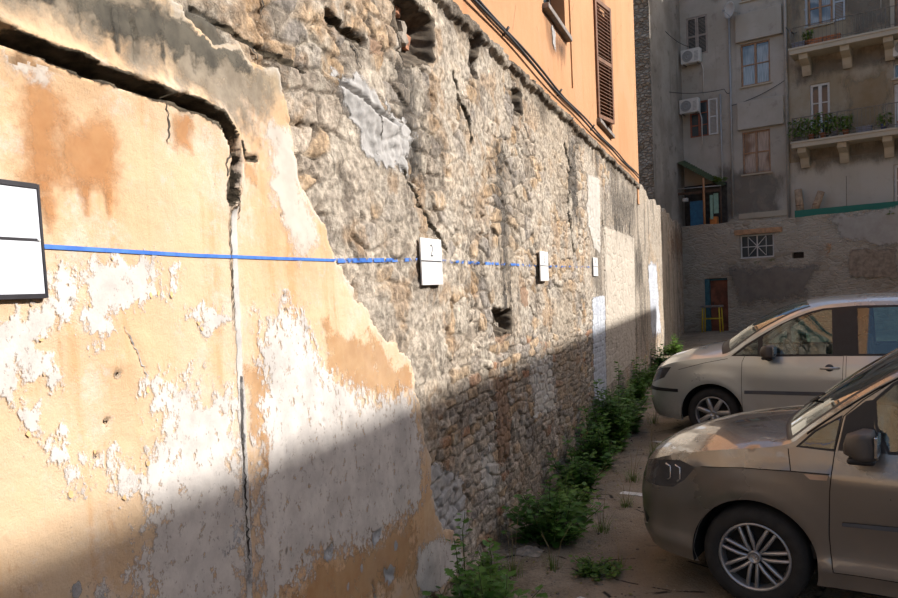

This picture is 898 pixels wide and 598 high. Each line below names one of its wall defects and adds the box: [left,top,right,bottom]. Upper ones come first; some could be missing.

crack [188,5,306,74]
spalling [389,0,436,68]
leakage [13,61,116,218]
crack [0,28,256,598]
peeling [0,243,429,598]